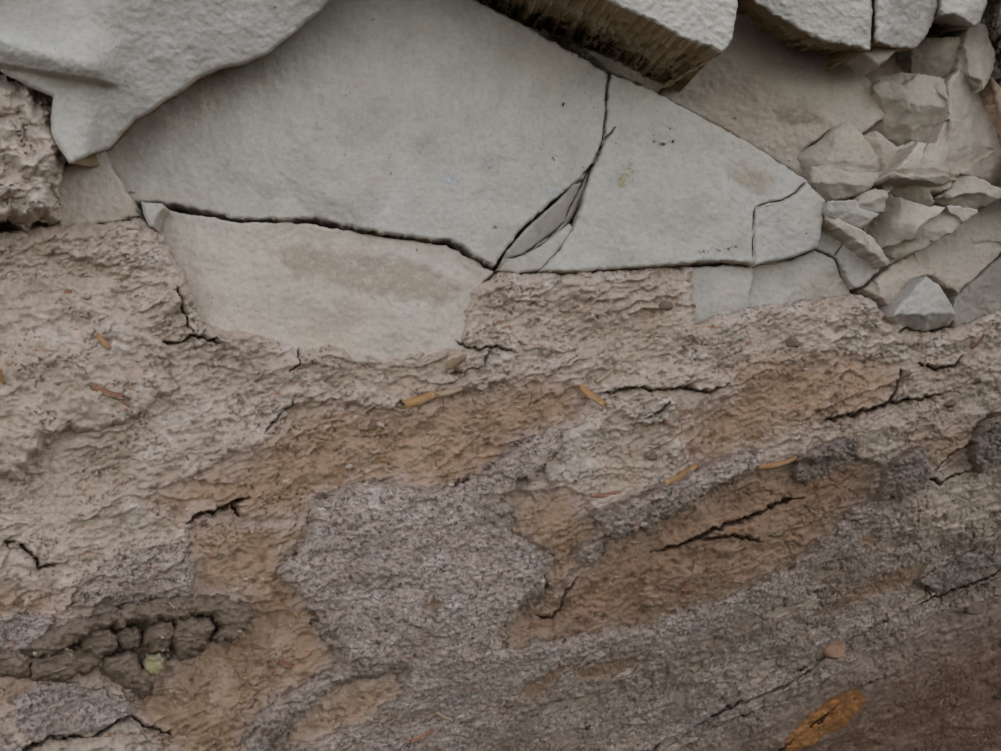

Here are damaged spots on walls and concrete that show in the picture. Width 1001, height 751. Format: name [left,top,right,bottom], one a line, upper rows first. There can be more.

crack [506,83,615,259]
crack [752,183,805,258]
crack [164,289,220,344]
crack [601,384,728,419]
crack [822,362,952,421]
crack [5,542,60,569]
crack [186,498,245,524]
peeling [0,346,1001,751]
crack [654,498,800,552]
crack [913,569,1001,606]
crack [24,716,173,749]
crack [681,700,754,734]